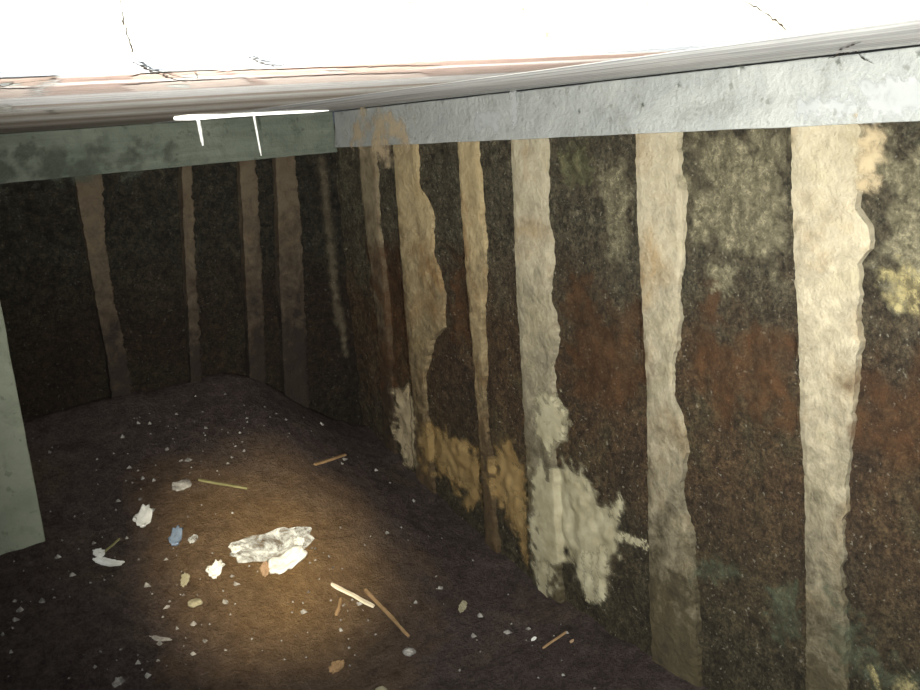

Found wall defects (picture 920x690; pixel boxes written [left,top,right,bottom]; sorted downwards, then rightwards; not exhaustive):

crack [119,0,198,82]
water stain [391,385,649,605]